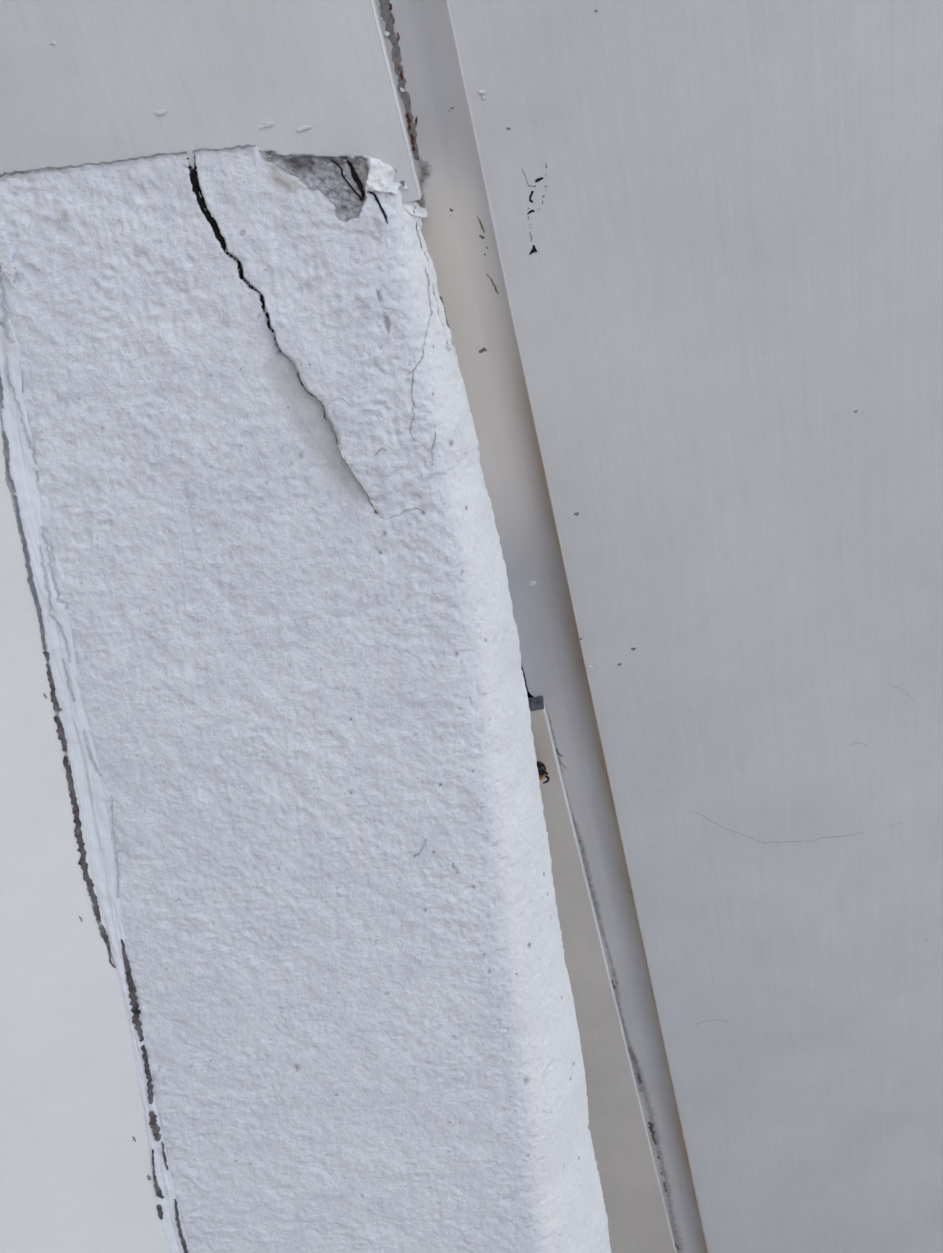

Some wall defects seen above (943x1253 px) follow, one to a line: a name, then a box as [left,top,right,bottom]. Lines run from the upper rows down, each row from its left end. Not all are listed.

crack [0,144,421,519]
spalling [259,150,428,221]
crack [0,377,188,1253]